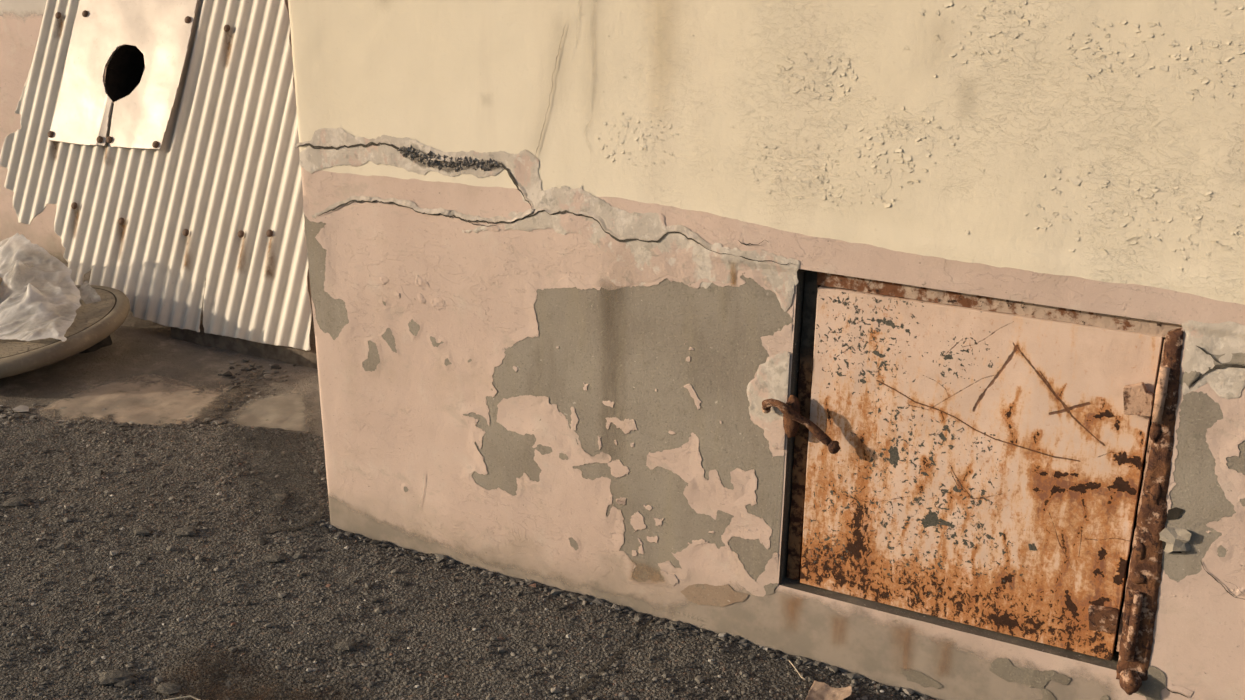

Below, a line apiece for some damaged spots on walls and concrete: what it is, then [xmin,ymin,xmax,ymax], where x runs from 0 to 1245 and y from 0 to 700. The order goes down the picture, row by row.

crack [295,26,795,265]
peeling [303,196,456,379]
peeling [451,269,794,607]
peeling [1159,379,1245,597]
crack [1179,346,1245,389]